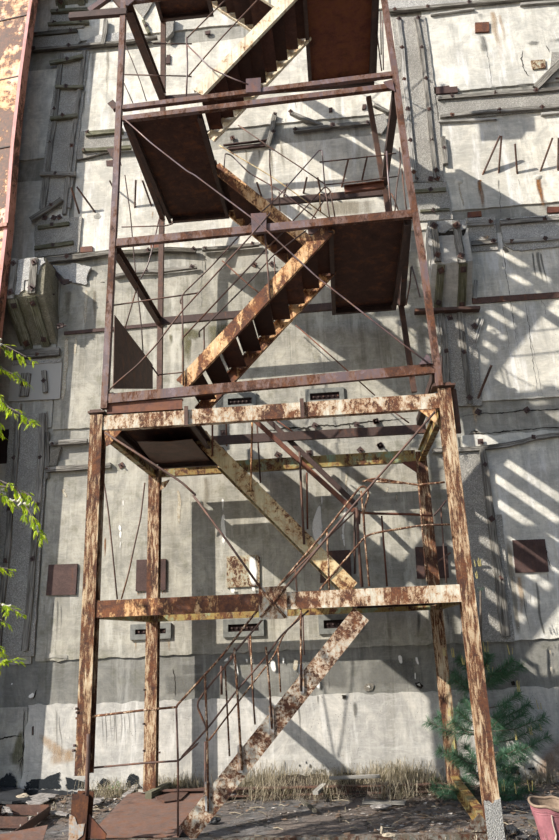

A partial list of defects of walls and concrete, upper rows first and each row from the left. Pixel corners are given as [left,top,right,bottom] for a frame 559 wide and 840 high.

crack [464,179,559,434]
peeling [0,772,84,814]
peeling [349,797,469,833]